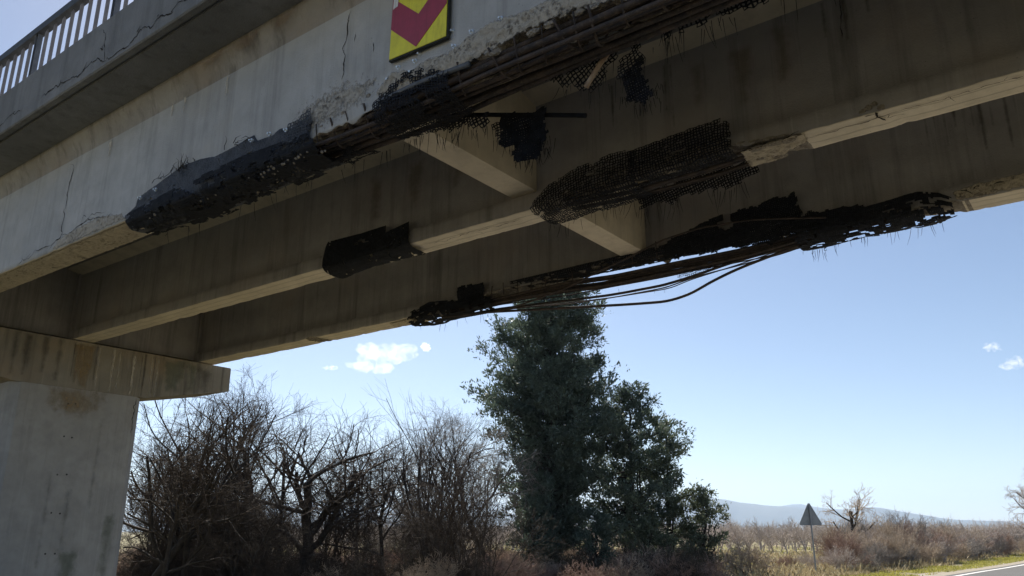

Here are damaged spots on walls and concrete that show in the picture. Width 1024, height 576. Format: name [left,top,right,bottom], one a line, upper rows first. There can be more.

crack [45,0,185,96]
crack [341,14,374,80]
spalling [294,0,606,128]
peeling [735,134,807,167]
crack [19,164,110,264]